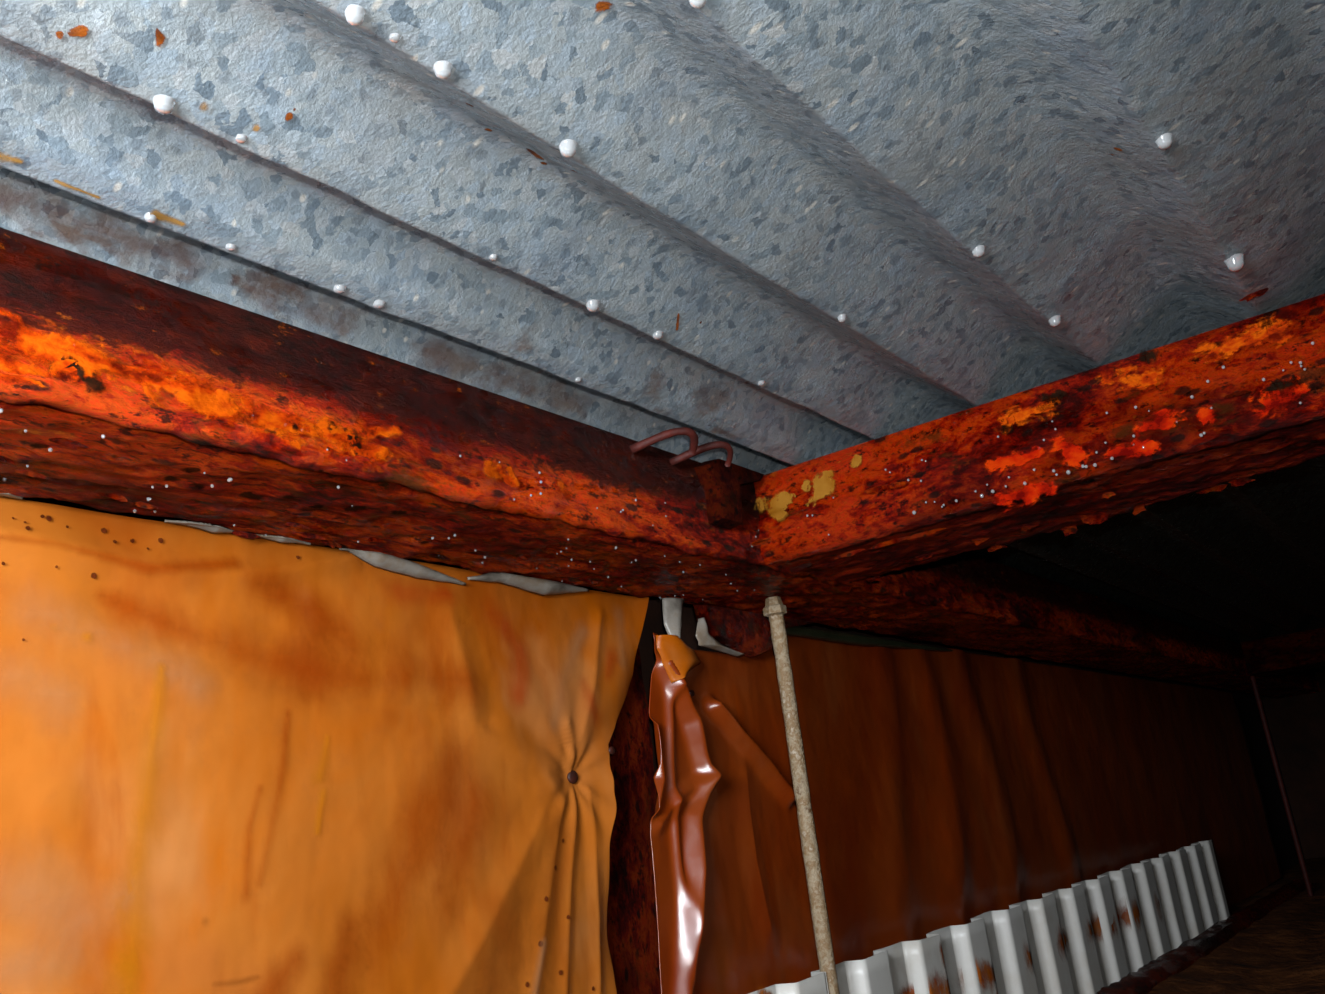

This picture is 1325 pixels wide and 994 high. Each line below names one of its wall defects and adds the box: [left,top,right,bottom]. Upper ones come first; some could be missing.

rust [150,210,186,226]
rust [1239,288,1268,302]
rust [49,438,89,450]
rust [0,455,49,480]
rust [1196,476,1255,494]
rust [104,494,158,509]
rust [1060,492,1116,537]
rust [232,531,261,539]
rust [970,537,1007,552]
rust [1058,932,1068,953]
rust [902,945,951,994]
rust [976,963,996,988]